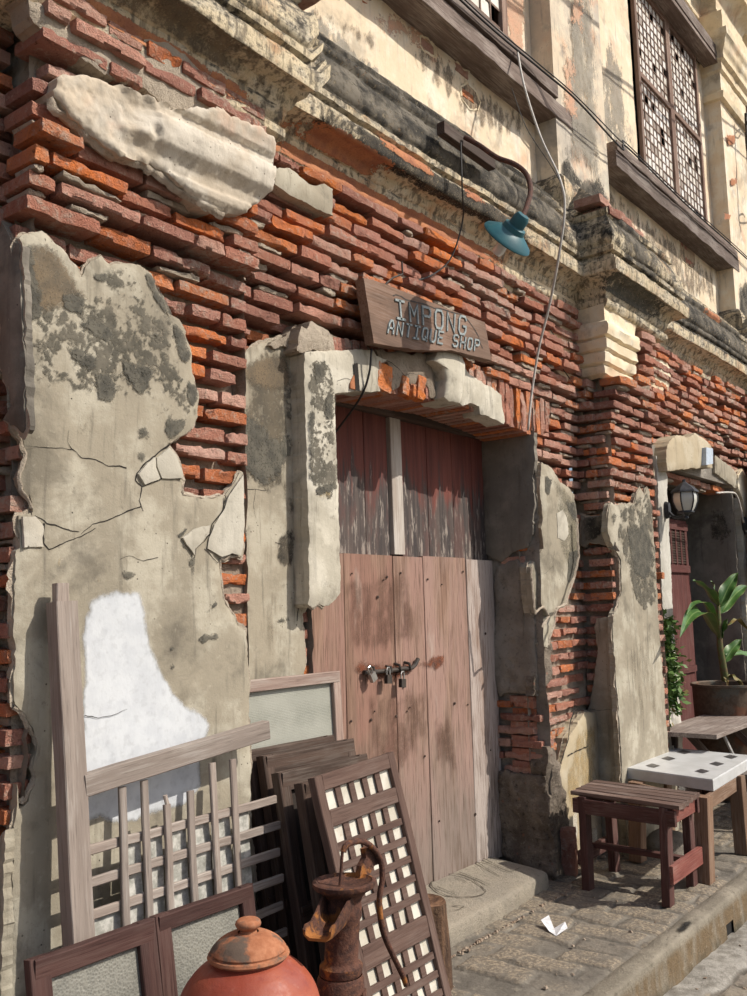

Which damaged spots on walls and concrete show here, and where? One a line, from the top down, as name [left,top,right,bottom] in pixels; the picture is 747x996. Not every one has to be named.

peeling [86,0,266,108]
peeling [276,118,504,265]
water stain [312,10,572,246]
water stain [564,0,747,367]
water stain [27,245,198,438]
water stain [572,304,641,380]
peeling [10,426,44,548]
crack [31,432,183,550]
spalling [137,270,250,626]
crack [194,489,264,563]
water stain [310,361,337,499]
spalling [0,705,40,825]